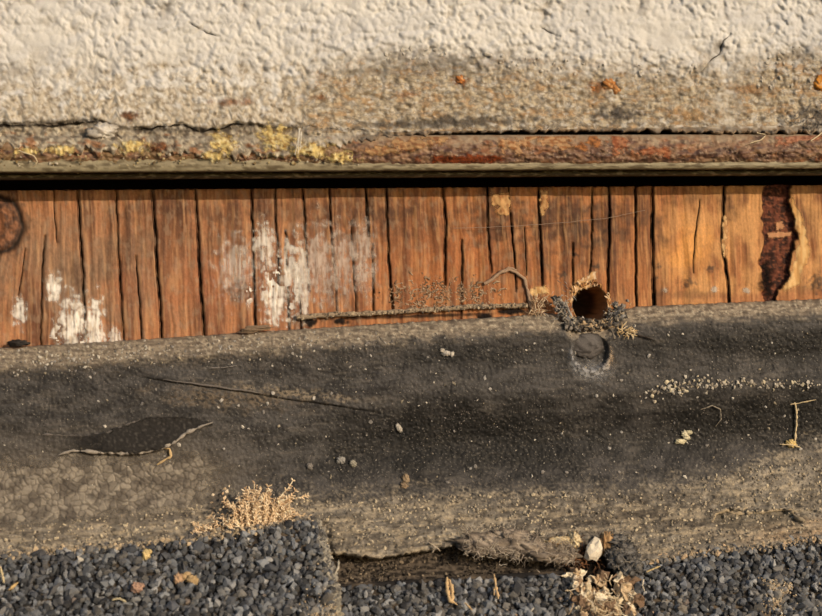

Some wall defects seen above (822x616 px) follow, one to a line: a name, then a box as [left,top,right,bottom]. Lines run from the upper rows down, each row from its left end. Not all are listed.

corrosion [813,67,822,91]
corrosion [590,78,621,95]
crack [0,120,98,128]
crack [140,123,251,132]
corrosion [146,142,167,151]
corrosion [432,152,502,164]
crack [146,377,372,412]